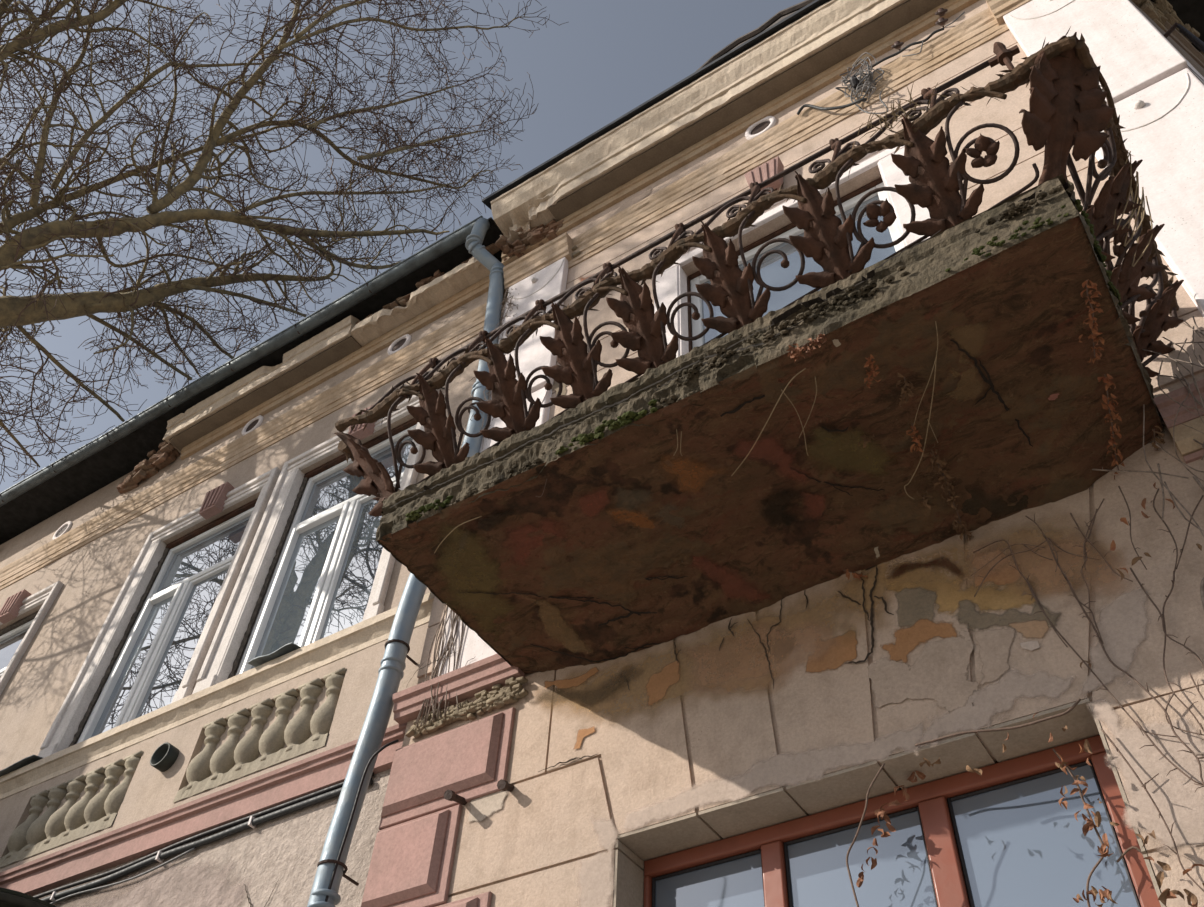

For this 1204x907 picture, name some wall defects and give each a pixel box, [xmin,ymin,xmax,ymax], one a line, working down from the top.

crack [950,339,1033,447]
damp [438,527,511,632]
crack [458,592,681,690]
crack [719,590,808,689]
crack [838,565,894,664]
peeling [578,558,1204,907]